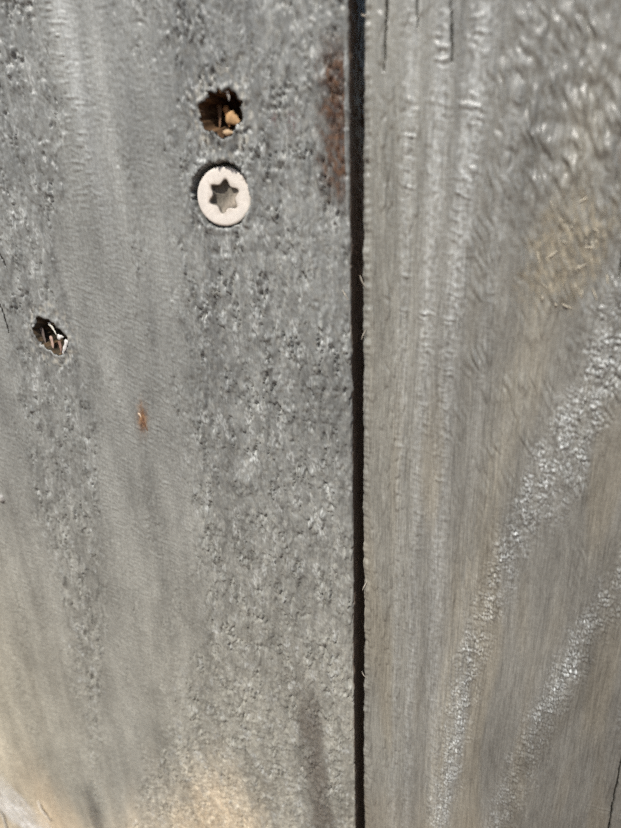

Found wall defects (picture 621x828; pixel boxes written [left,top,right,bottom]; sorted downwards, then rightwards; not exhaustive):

rust [318,53,346,195]
crack [608,760,621,828]